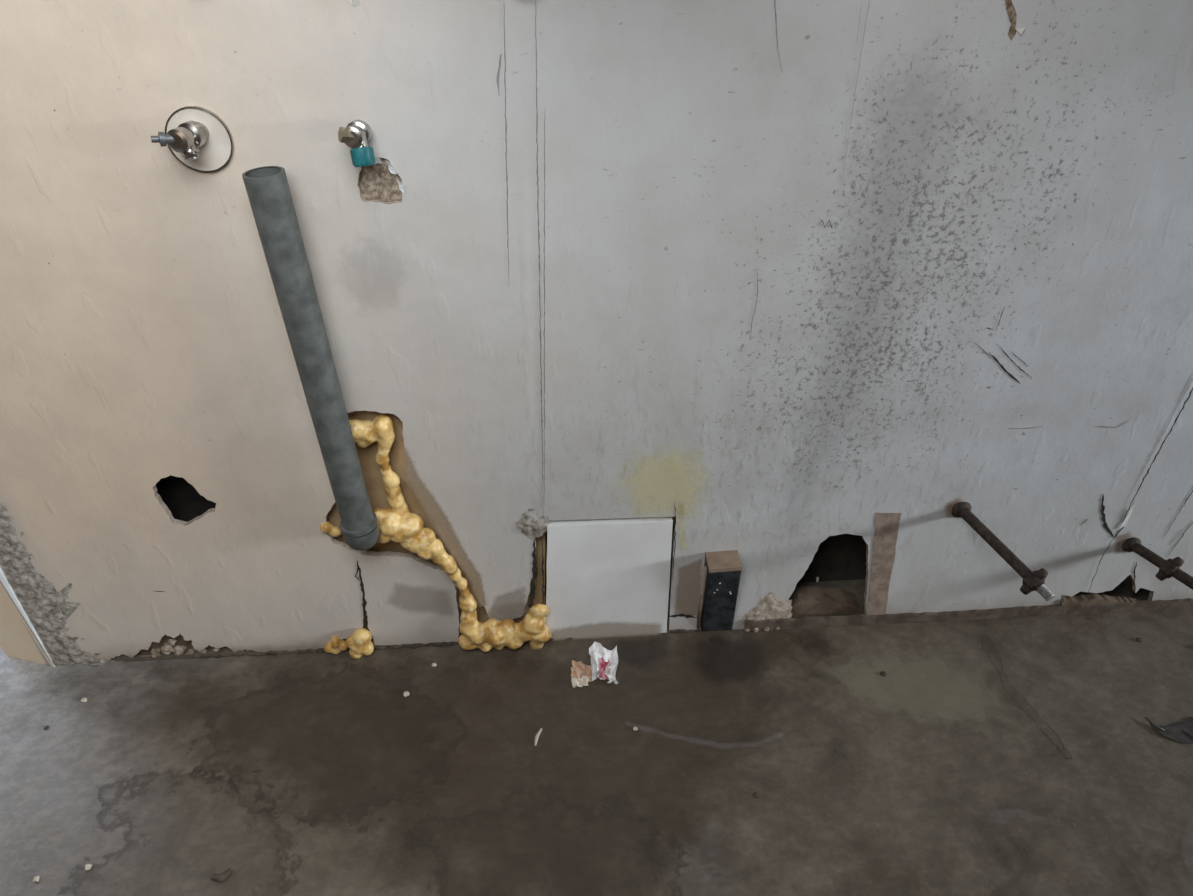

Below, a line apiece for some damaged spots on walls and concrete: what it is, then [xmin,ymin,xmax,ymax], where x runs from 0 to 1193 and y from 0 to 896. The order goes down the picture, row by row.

peeling [1005,0,1025,41]
spalling [359,157,405,202]
crack [1080,388,1193,595]
spalling [0,503,123,666]
crack [355,561,367,629]